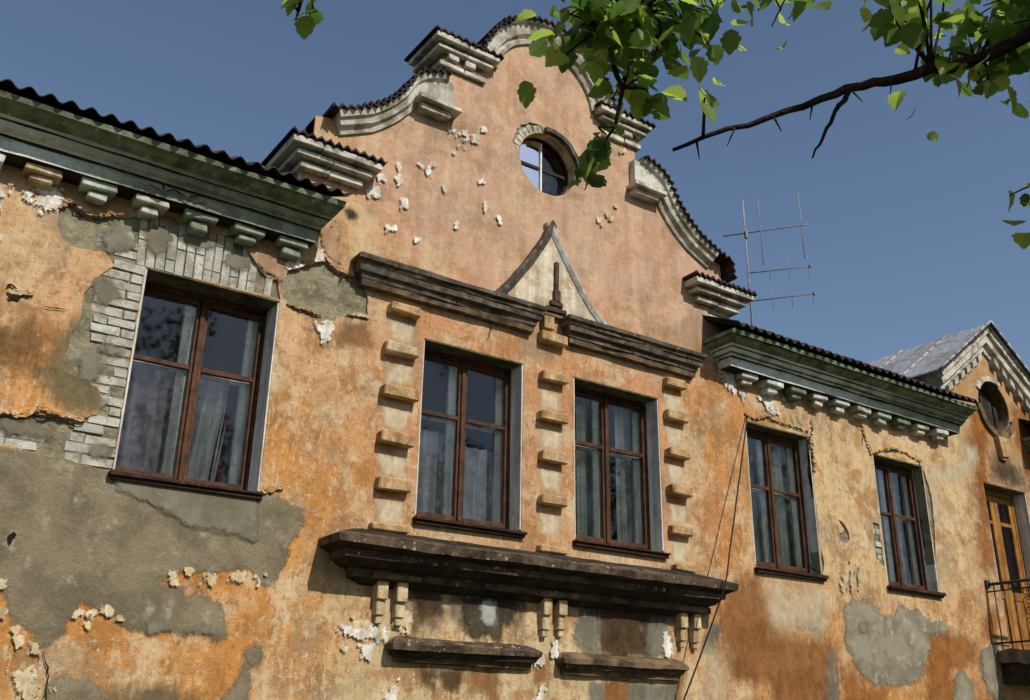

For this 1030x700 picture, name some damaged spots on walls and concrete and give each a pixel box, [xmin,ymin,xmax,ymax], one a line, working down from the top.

peeling [448,126,487,154]
peeling [366,161,409,210]
peeling [417,160,447,192]
flaking render [0,182,367,471]
peeling [168,566,268,588]
peeling [72,604,126,630]
peeling [335,605,418,662]
peeling [0,606,57,700]
peeling [534,636,561,669]
peeling [383,676,405,700]
peeling [533,683,548,700]